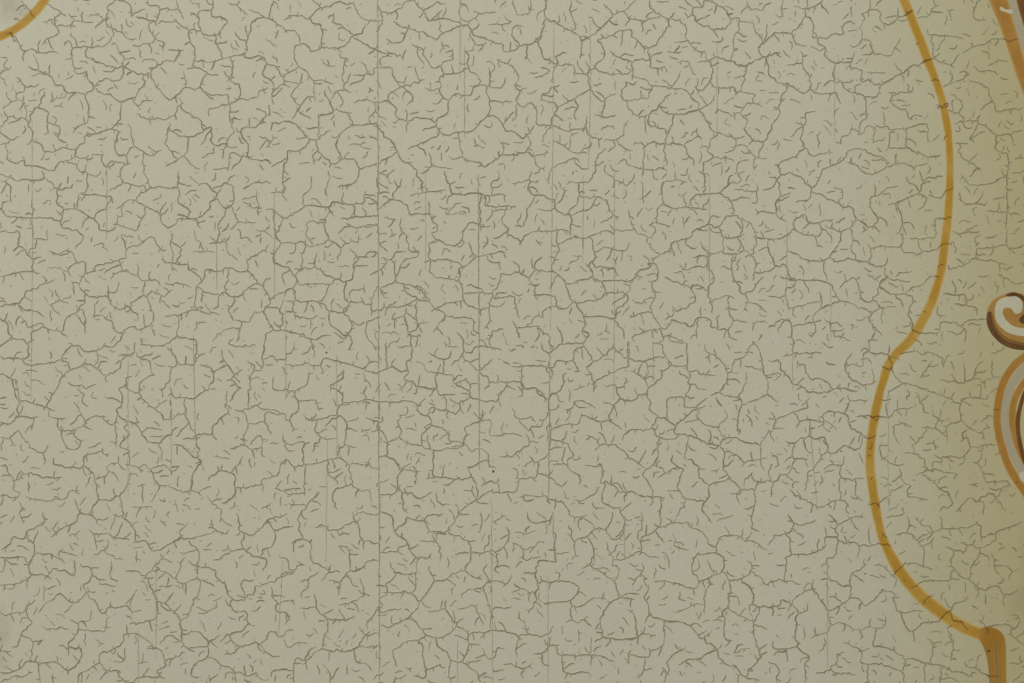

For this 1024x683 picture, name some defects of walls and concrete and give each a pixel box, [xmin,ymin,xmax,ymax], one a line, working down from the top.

crack [348,134,377,158]
crack [242,190,261,216]
crack [242,176,271,189]
crack [937,93,1024,294]
crack [192,230,215,253]
crack [901,339,949,378]
crack [869,442,928,510]
crack [470,512,511,533]
crack [972,605,1024,651]
crack [317,664,339,683]
crack [765,662,796,683]
crack [815,651,856,676]